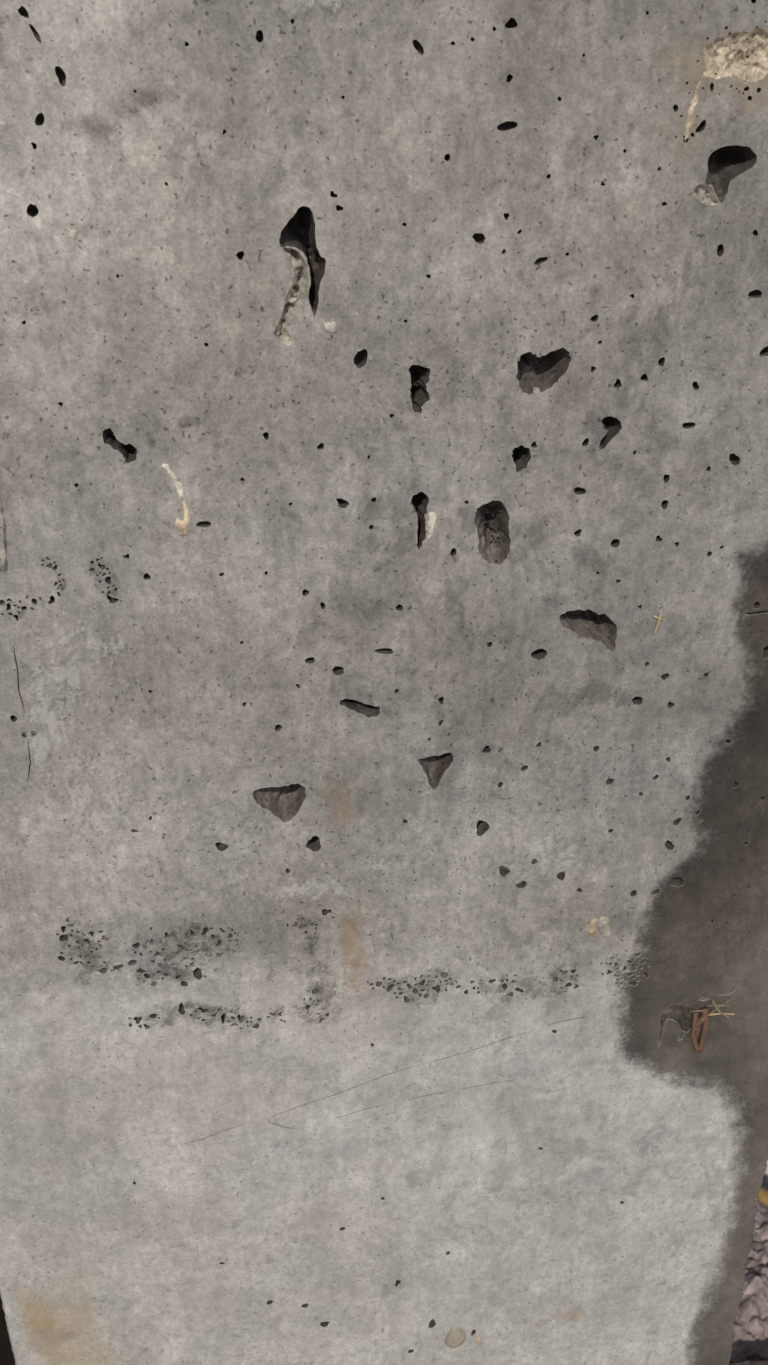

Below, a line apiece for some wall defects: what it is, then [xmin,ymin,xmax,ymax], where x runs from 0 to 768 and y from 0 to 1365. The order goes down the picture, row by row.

peeling [662,21,768,205]
water stain [621,547,768,1365]